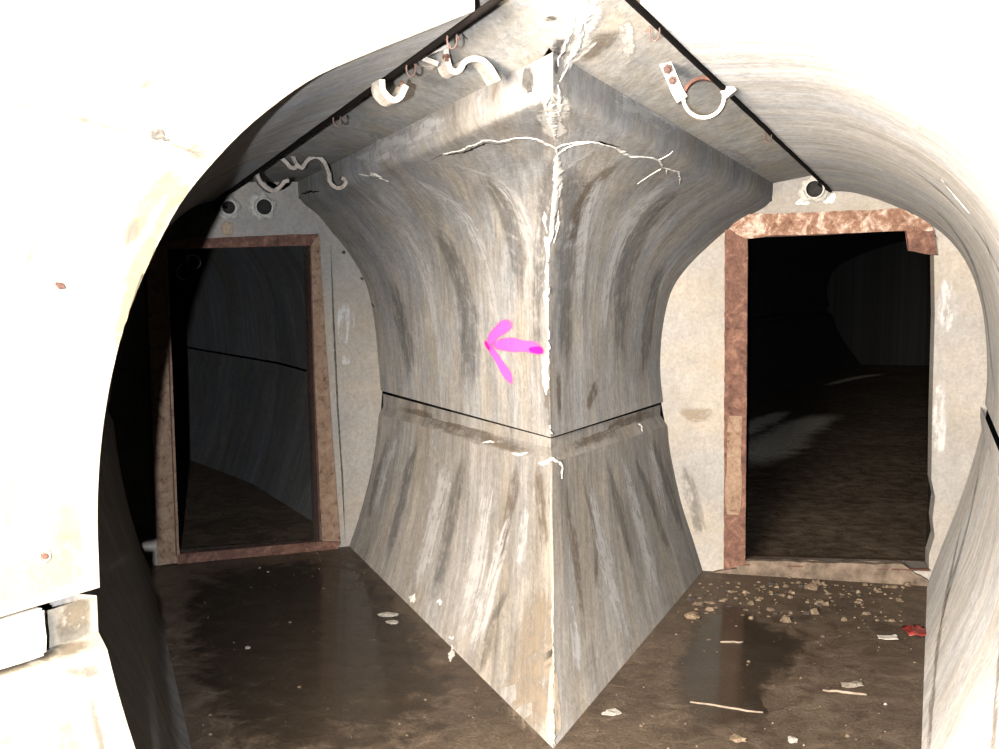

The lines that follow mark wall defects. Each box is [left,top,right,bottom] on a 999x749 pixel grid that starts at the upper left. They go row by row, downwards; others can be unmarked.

leakage [619,22,635,57]
leakage [356,118,444,182]
leakage [371,200,437,335]
leakage [418,180,499,323]
leakage [460,0,602,395]
crack [433,137,681,184]